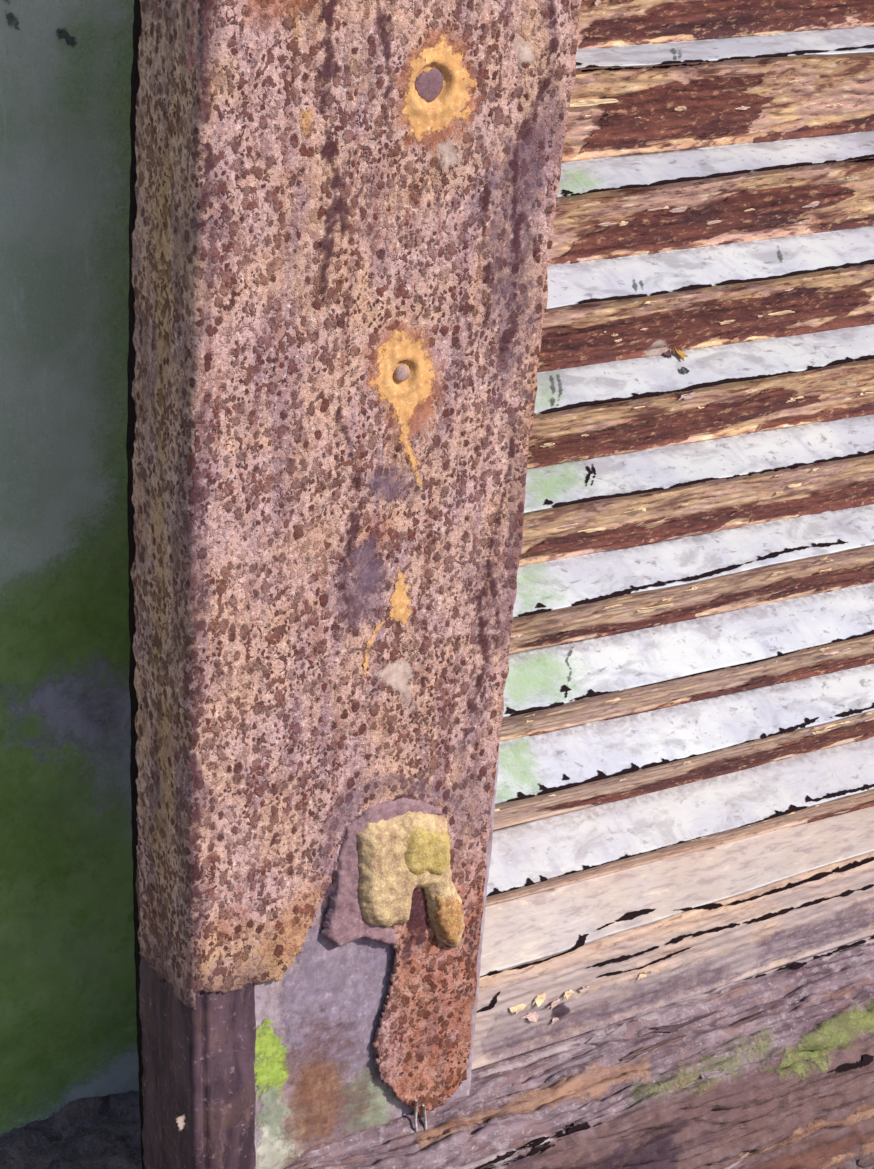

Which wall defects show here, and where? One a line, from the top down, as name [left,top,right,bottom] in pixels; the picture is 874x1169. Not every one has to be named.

peeling [579,0,874,48]
peeling [569,74,874,154]
peeling [537,281,874,374]
peeling [527,388,874,468]
peeling [520,474,874,559]
rust [131,0,650,1149]
water stain [0,662,132,809]
crack [487,784,874,897]
crack [477,857,874,1013]
water stain [39,1051,139,1121]
crack [830,1054,874,1073]
crack [475,1122,605,1169]